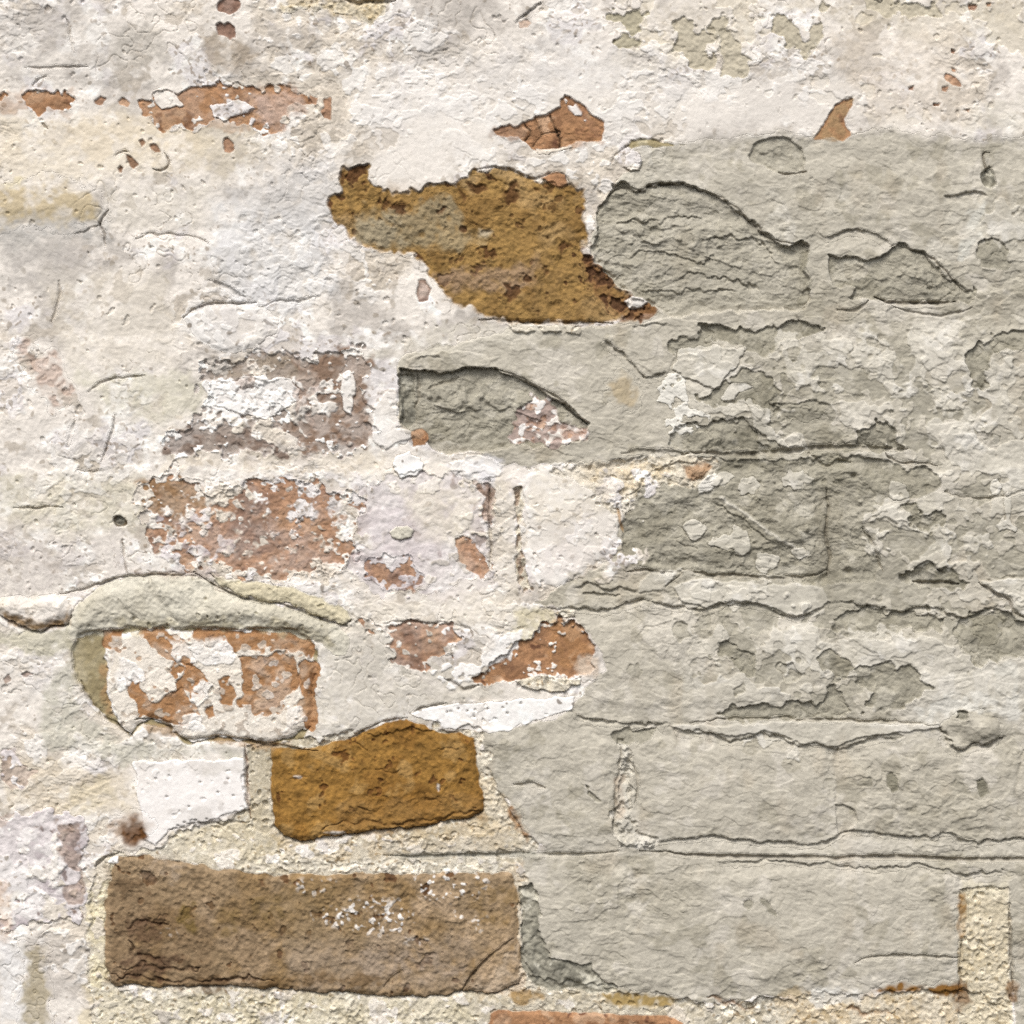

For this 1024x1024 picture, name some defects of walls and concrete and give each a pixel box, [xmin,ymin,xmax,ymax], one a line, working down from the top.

spalling [0,89,76,118]
spalling [94,80,332,173]
spalling [493,95,605,155]
spalling [824,228,977,314]
spalling [326,136,947,587]
peeling [131,342,590,600]
crack [59,539,348,627]
crack [544,567,1024,623]
peeling [357,618,464,672]
spalling [471,612,596,692]
crack [572,710,941,755]
spalling [72,627,1016,1024]